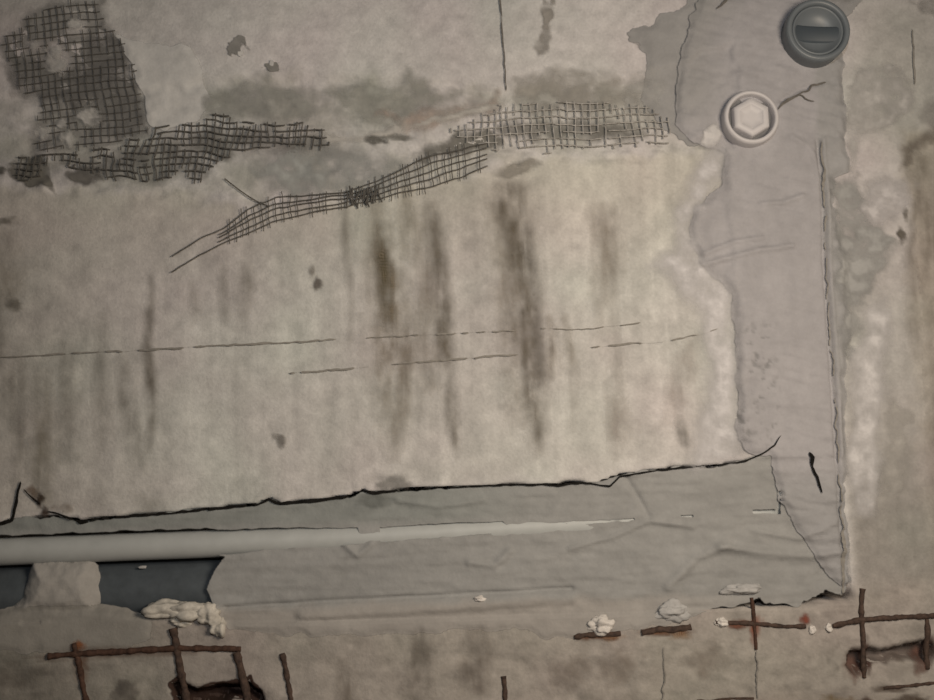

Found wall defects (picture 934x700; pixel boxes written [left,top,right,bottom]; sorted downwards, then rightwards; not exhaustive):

peeling [227,35,246,57]
crack [499,0,507,90]
peeling [537,0,555,54]
peeling [0,0,147,189]
flaking render [326,125,408,144]
flaking render [421,129,502,163]
flaking render [502,159,535,178]
peeling [516,71,639,139]
water stain [375,244,395,290]
water stain [500,202,526,288]
crack [809,143,847,593]
crack [0,437,780,525]